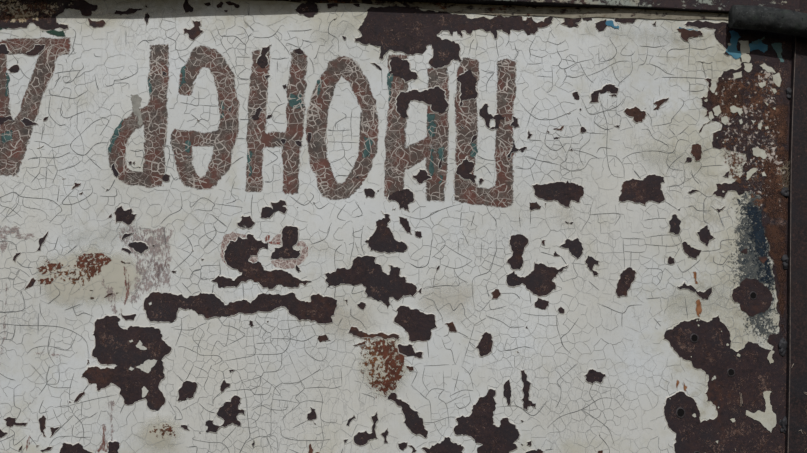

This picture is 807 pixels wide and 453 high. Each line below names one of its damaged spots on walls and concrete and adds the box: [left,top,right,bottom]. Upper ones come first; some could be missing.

peeling [342,3,637,158]
corrosion [710,78,742,110]
corrosion [37,253,111,286]
peeling [69,168,458,453]
crack [259,201,365,271]
peeling [491,234,600,314]
crack [526,211,575,256]
peeling [618,174,666,207]
peeling [662,20,793,453]
corrosion [762,104,789,315]
corrosion [355,338,405,398]
peeling [343,369,545,453]